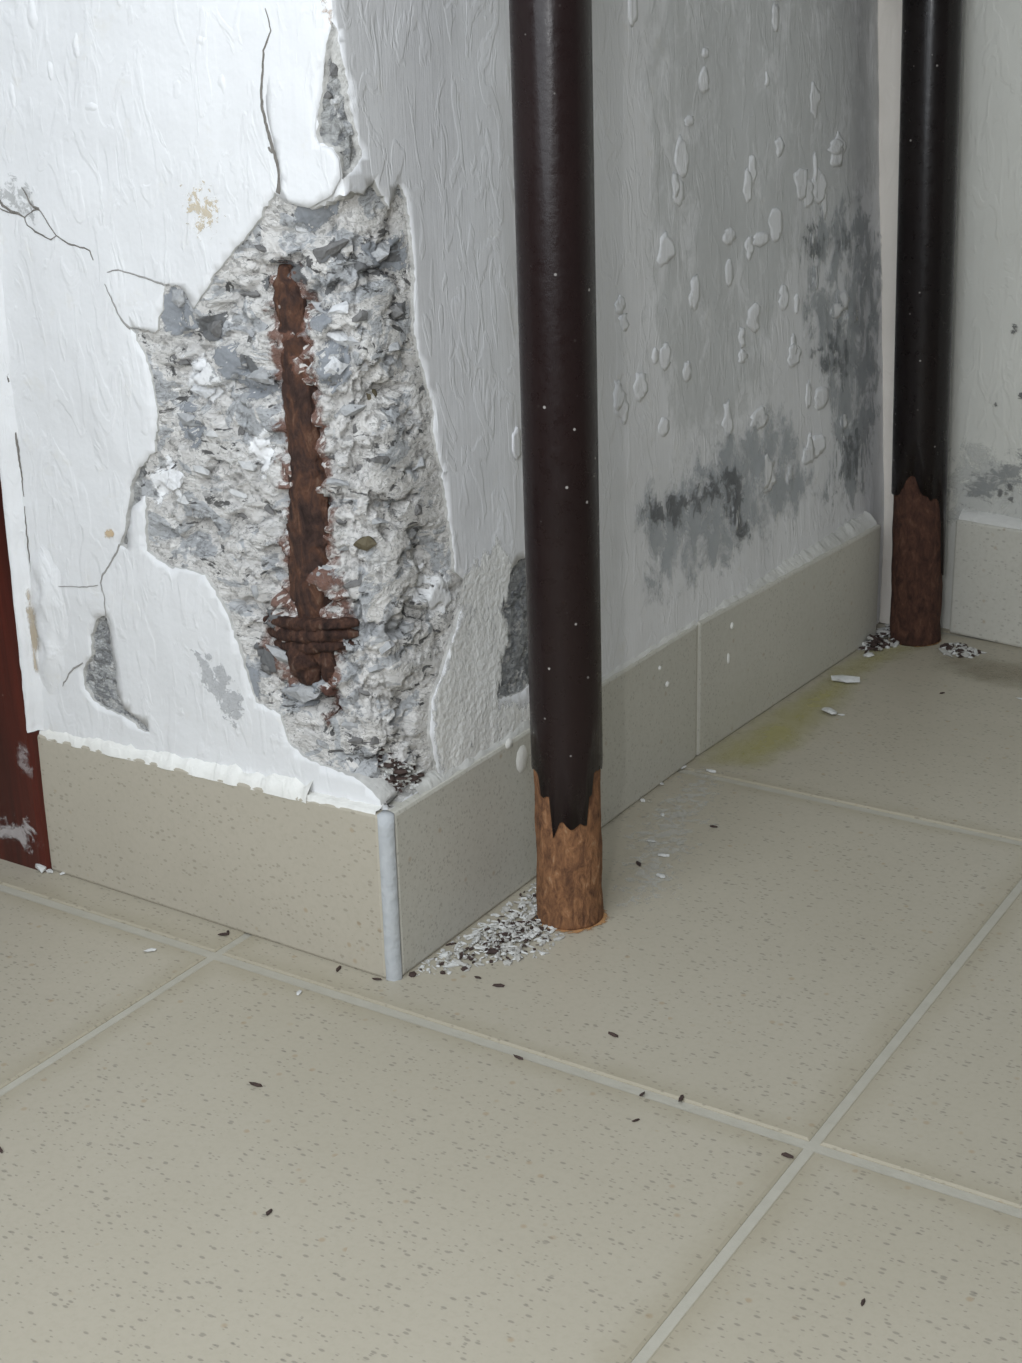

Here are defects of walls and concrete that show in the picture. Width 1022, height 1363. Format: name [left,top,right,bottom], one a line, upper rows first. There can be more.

crack [260,8,281,194]
flaking render [319,57,356,171]
crack [0,187,164,330]
leakage [800,191,881,508]
spalling [123,186,466,795]
corrosion [261,260,354,687]
leakage [640,418,812,587]
leakage [948,444,1022,520]
flaking render [86,616,149,731]
corrosion [320,639,347,726]
flaking render [497,559,529,698]